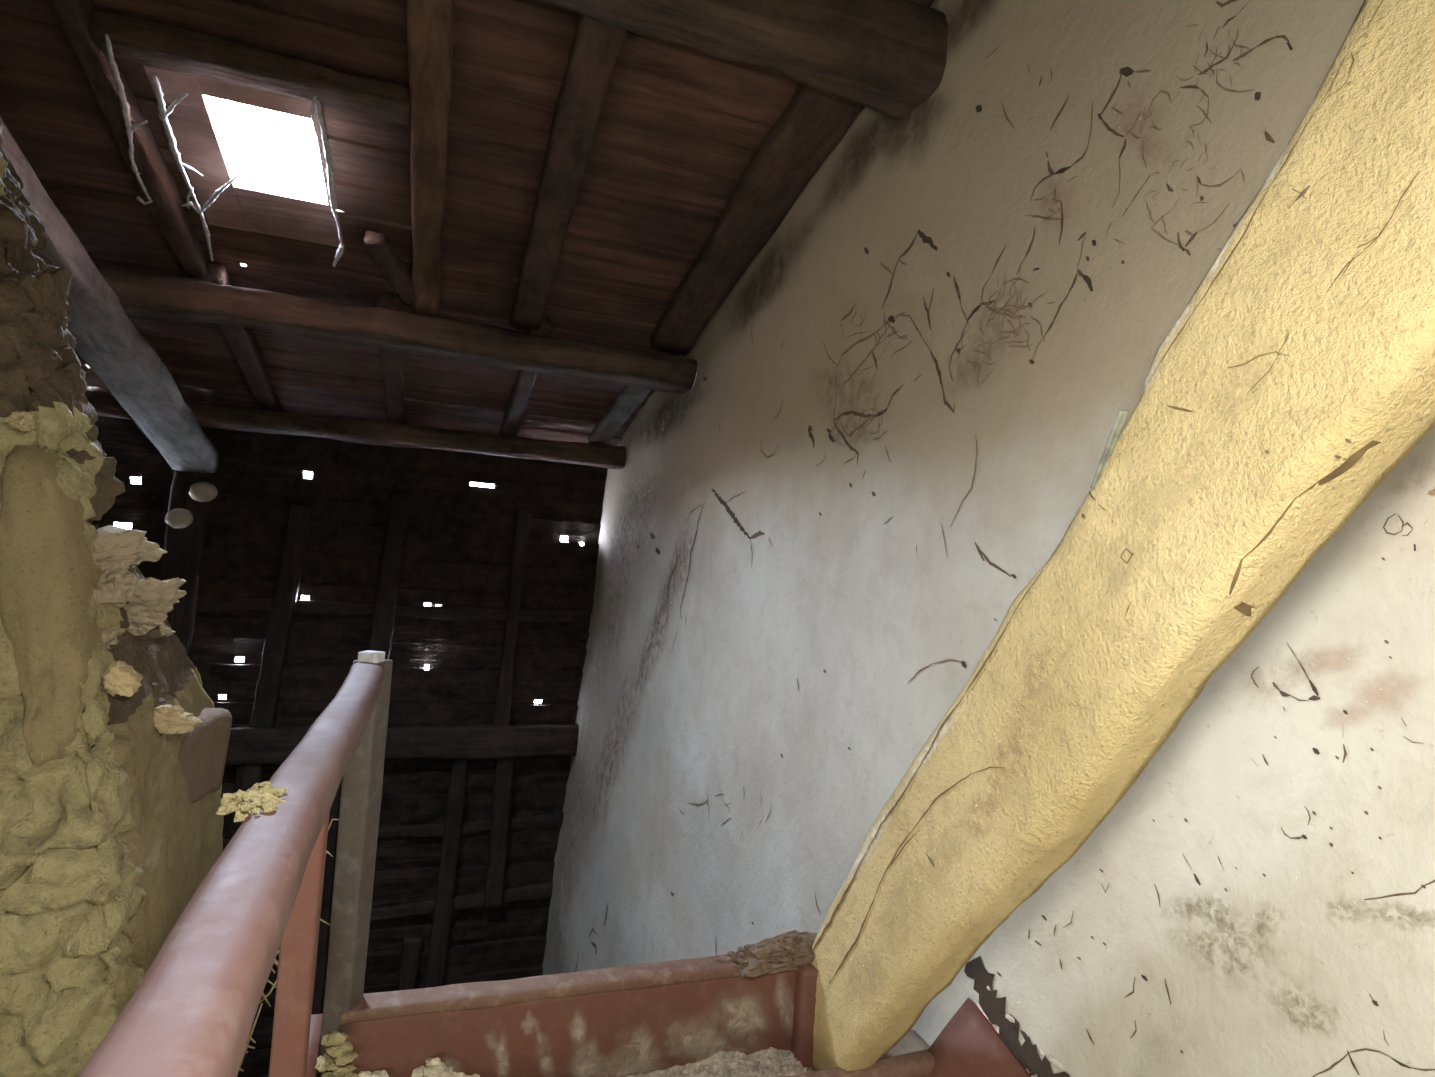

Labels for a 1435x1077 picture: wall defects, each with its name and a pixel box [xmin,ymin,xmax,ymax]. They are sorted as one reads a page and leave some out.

crack [637,488,773,651]
crack [761,0,1383,984]
crack [1382,513,1427,561]
crack [1251,642,1423,765]
crack [678,785,771,836]
crack [1281,806,1435,900]
spalling [964,956,1070,1077]
crack [1125,975,1171,1038]
crack [1313,994,1435,1077]